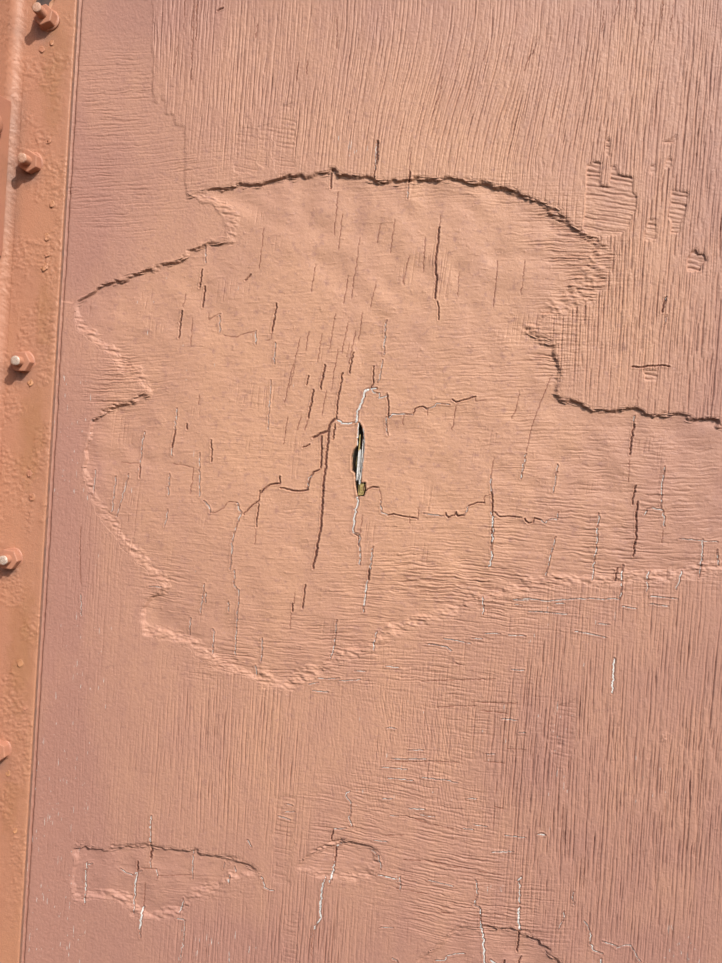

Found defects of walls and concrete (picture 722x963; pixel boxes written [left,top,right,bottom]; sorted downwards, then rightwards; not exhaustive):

crack [511,365,719,638]